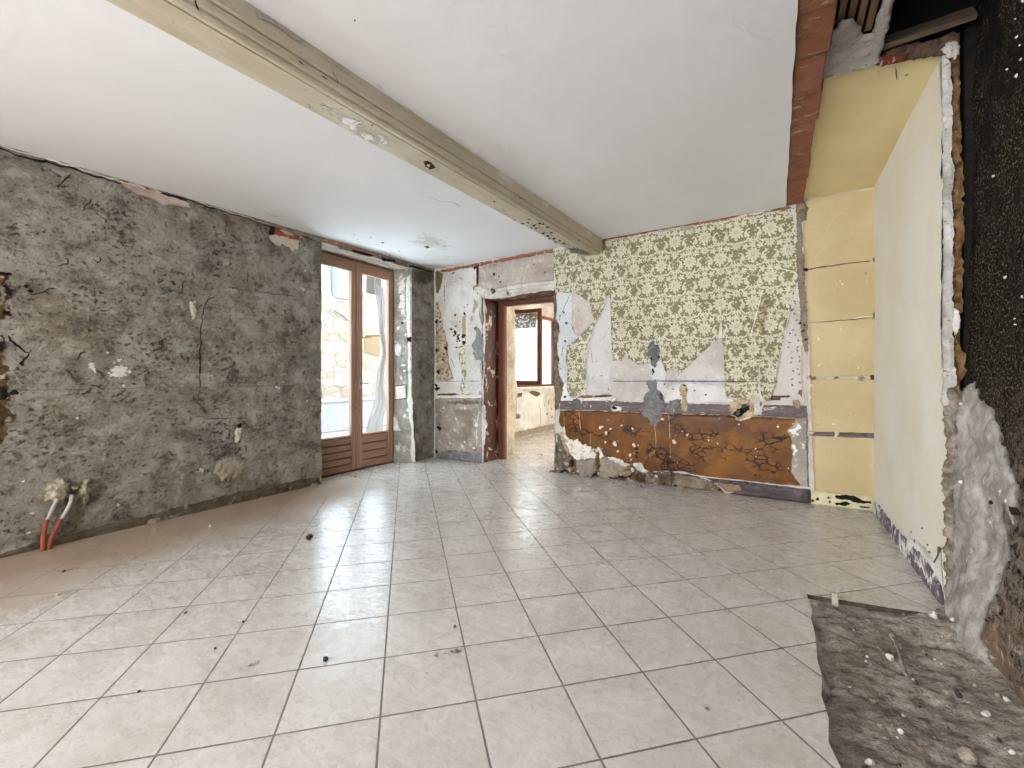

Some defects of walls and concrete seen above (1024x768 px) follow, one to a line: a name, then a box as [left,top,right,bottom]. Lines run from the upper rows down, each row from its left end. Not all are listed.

spalling [119,180,190,208]
spalling [268,226,300,251]
spalling [0,335,24,444]
crack [196,273,297,419]
spalling [321,239,725,493]
spalling [729,398,755,425]
spalling [876,6,978,588]